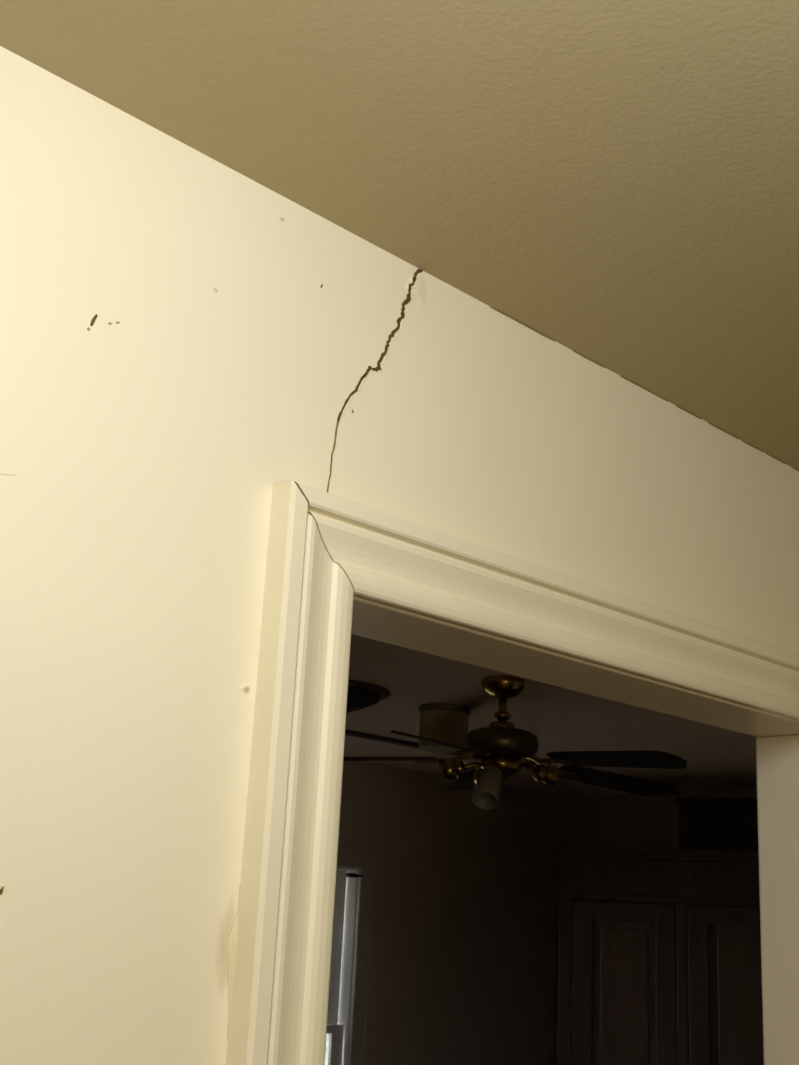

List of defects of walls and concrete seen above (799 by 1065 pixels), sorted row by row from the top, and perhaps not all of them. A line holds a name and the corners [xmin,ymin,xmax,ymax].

crack [295,269,423,590]